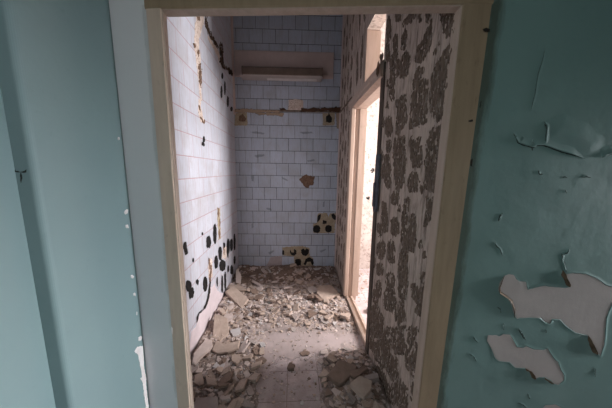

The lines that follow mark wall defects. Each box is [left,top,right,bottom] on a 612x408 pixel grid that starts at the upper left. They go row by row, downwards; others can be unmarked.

spalling [205,16,233,76]
spalling [299,174,315,188]
spalling [217,207,227,259]
peeling [282,246,314,266]
peeling [313,213,336,233]
spalling [190,258,225,352]
peeling [498,270,612,359]
peeling [134,336,149,408]
peeling [487,333,567,387]